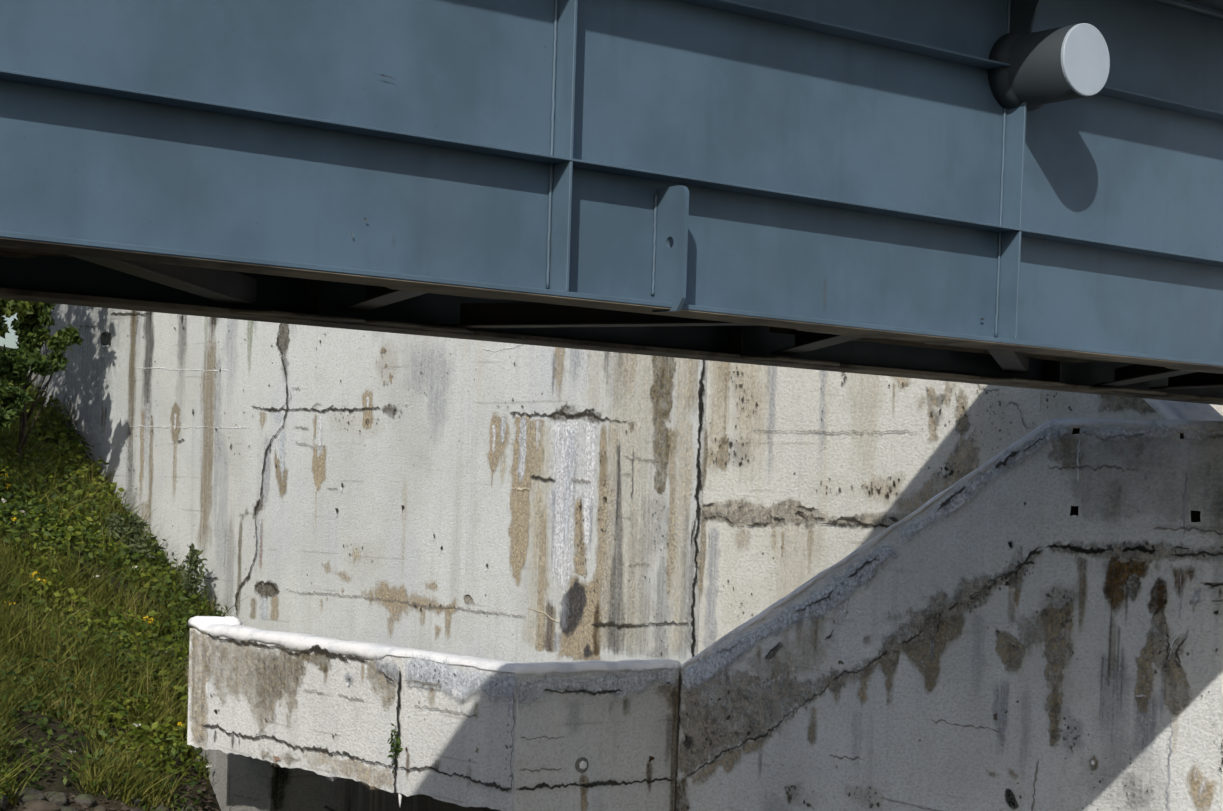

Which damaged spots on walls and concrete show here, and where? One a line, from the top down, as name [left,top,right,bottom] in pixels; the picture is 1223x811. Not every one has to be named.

leakage [124,310,154,516]
leakage [171,403,180,443]
leakage [205,640,329,723]
leakage [488,415,634,661]
leakage [644,356,691,593]
crack [201,357,1223,811]
peeling [374,387,1057,790]
leakage [858,614,964,704]
spalling [825,541,1209,692]
leakage [993,604,1073,746]
leakage [1135,632,1189,728]
spalling [1005,771,1022,809]